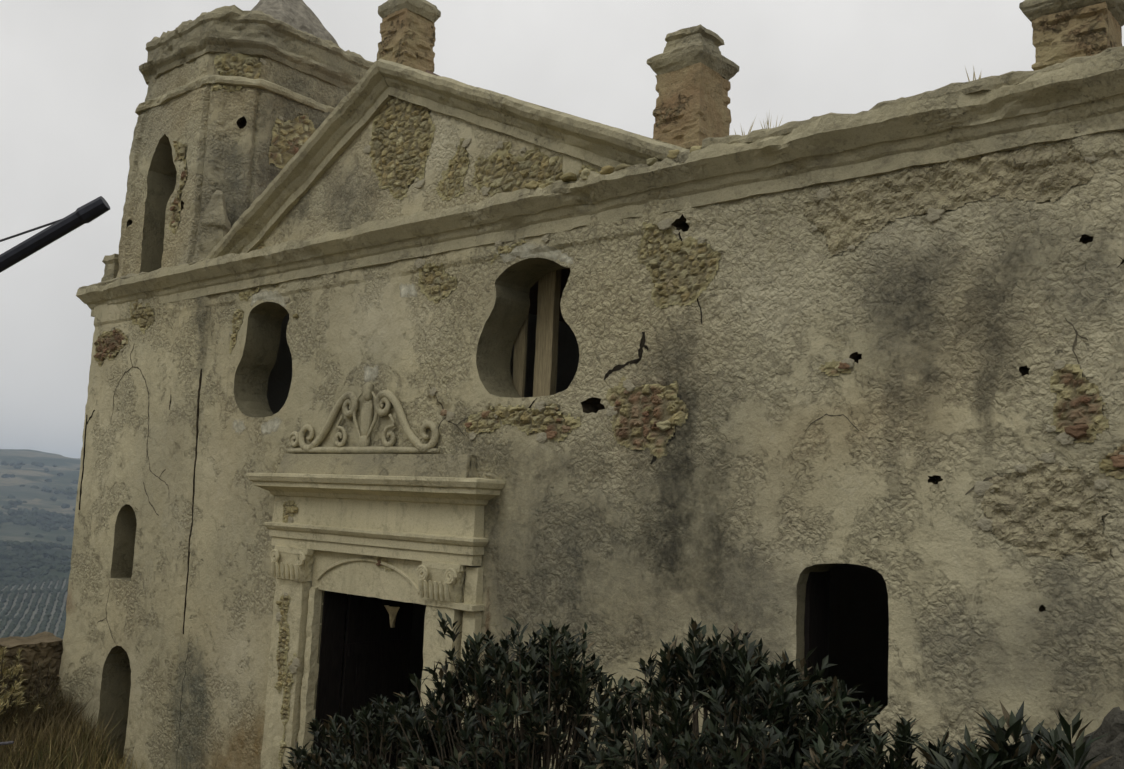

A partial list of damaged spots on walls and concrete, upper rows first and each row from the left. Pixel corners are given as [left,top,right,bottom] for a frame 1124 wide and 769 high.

flaking render [211,52,266,92]
flaking render [268,113,315,169]
flaking render [363,96,600,201]
flaking render [414,258,457,303]
flaking render [637,214,721,309]
flaking render [93,299,155,367]
crack [604,332,649,380]
flaking render [440,376,689,459]
flaking render [974,360,1124,562]
crack [79,343,202,769]